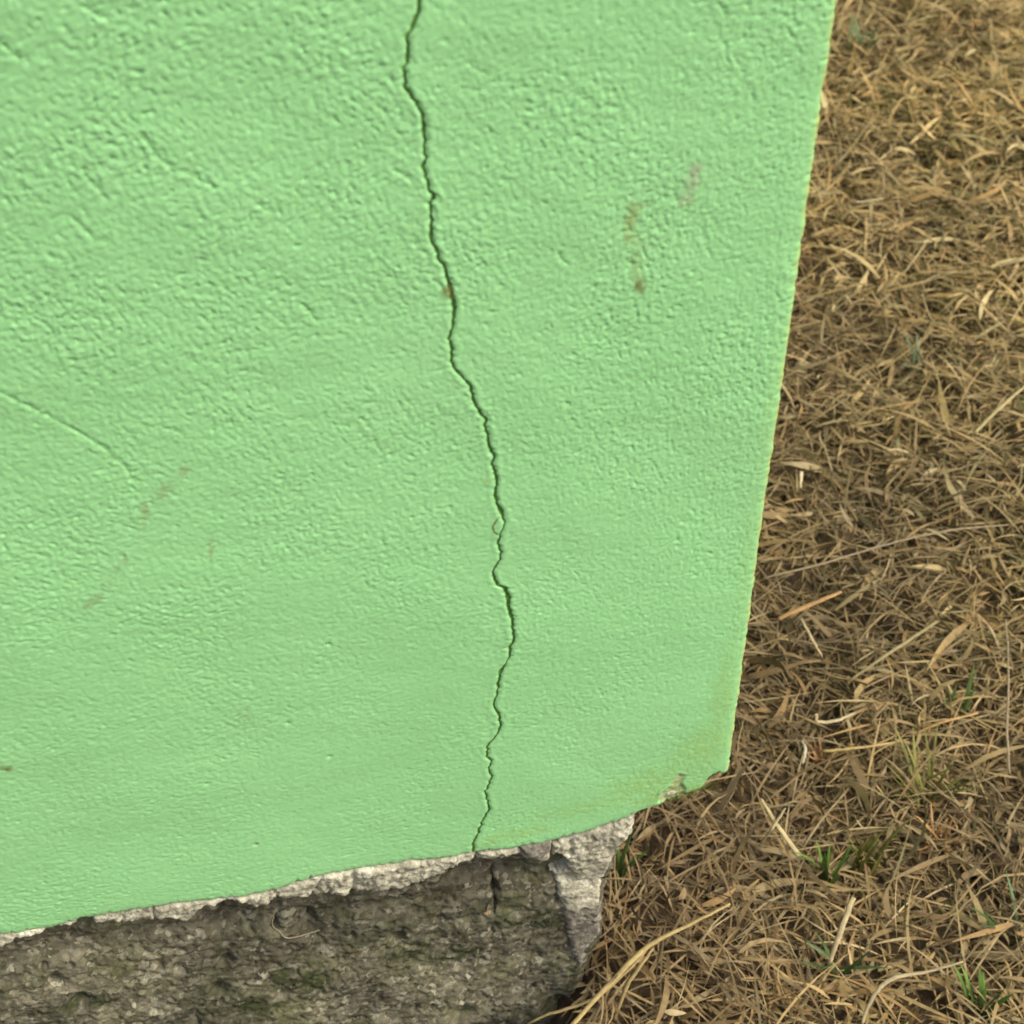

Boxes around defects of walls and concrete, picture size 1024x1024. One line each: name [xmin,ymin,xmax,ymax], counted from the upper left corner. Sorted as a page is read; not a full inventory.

crack [401,0,515,913]
spalling [0,919,77,947]
spalling [92,814,635,966]